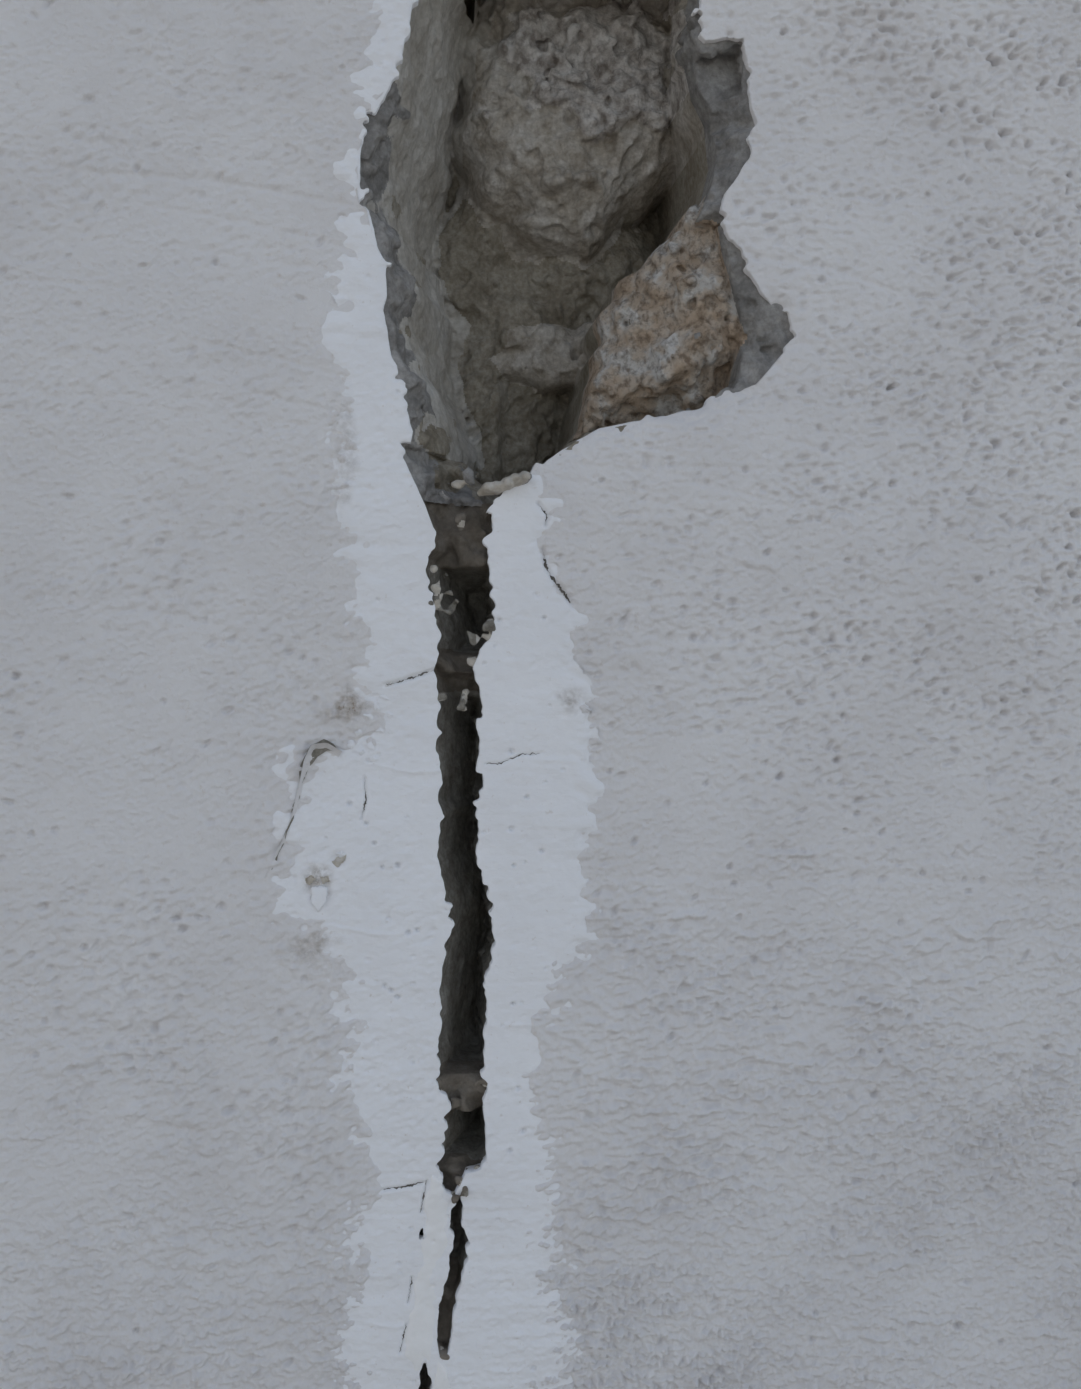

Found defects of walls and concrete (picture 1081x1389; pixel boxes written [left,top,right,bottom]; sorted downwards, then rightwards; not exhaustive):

spalling [359,0,794,507]
crack [384,501,540,1389]